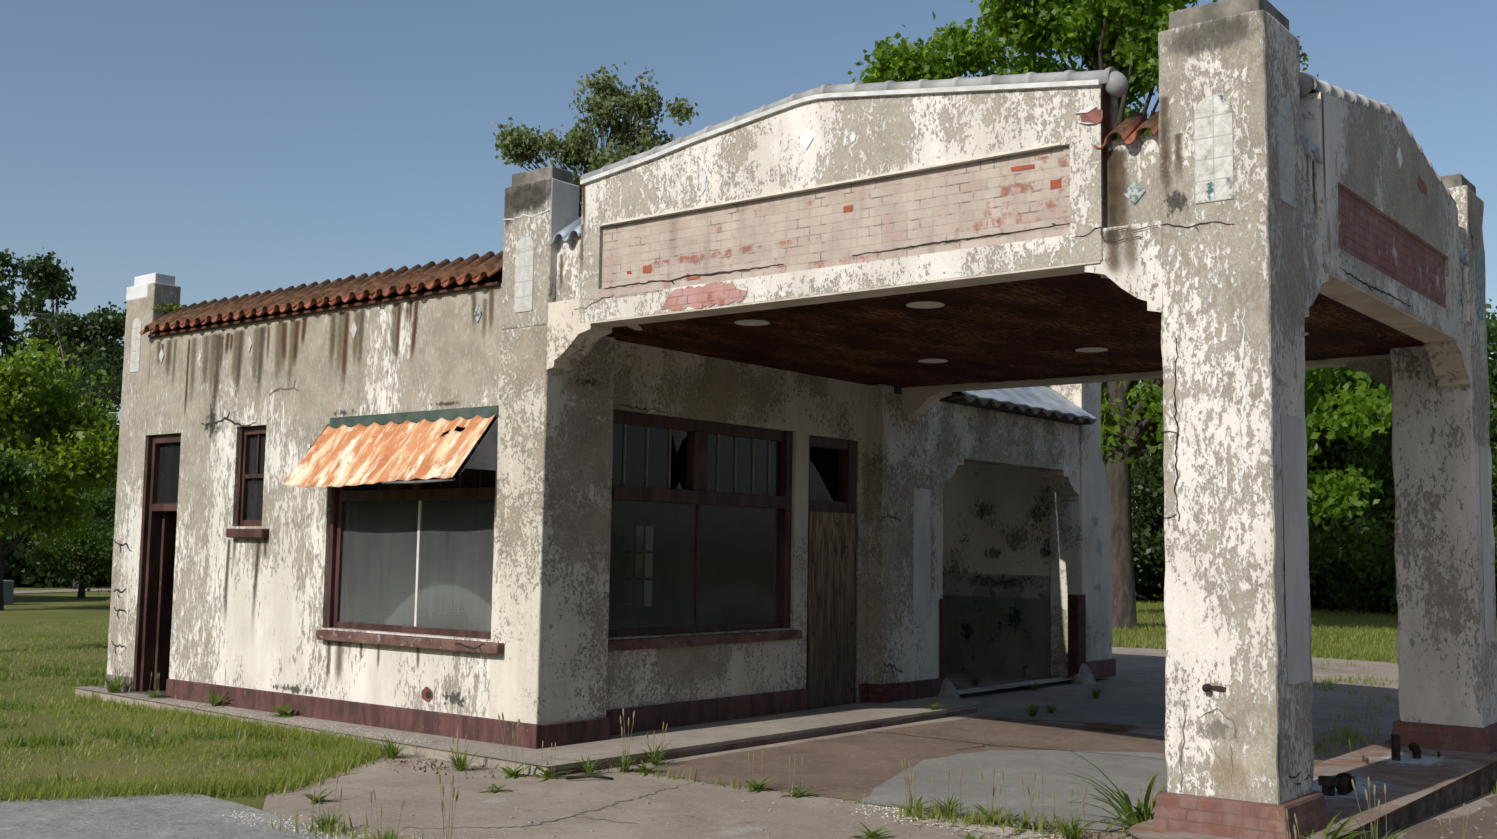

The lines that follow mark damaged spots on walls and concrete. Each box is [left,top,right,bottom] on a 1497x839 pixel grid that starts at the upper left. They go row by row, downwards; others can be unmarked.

crack [852,221,1231,256]
water stain [472,288,493,329]
spalling [662,276,748,310]
water stain [158,340,176,373]
water stain [330,309,364,375]
water stain [204,326,269,437]
corrosion [283,414,496,488]